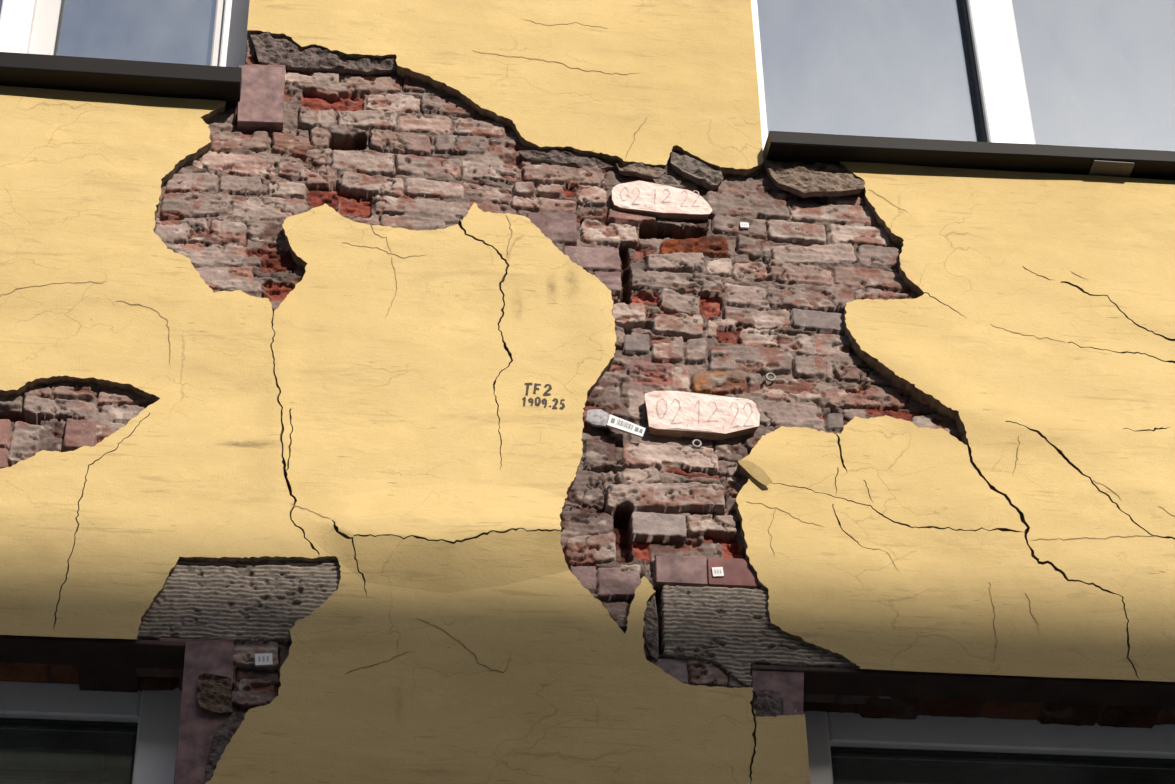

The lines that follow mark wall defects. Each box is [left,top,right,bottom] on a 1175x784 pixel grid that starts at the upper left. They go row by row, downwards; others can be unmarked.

spalling [0,375,160,469]
crack [54,413,150,627]
crack [343,225,422,320]
crack [270,313,563,598]
crack [457,216,513,471]
spalling [136,30,968,718]
crack [746,421,1175,682]
crack [925,266,1175,363]
spalling [136,635,292,784]
crack [416,618,511,673]
crack [749,691,757,784]